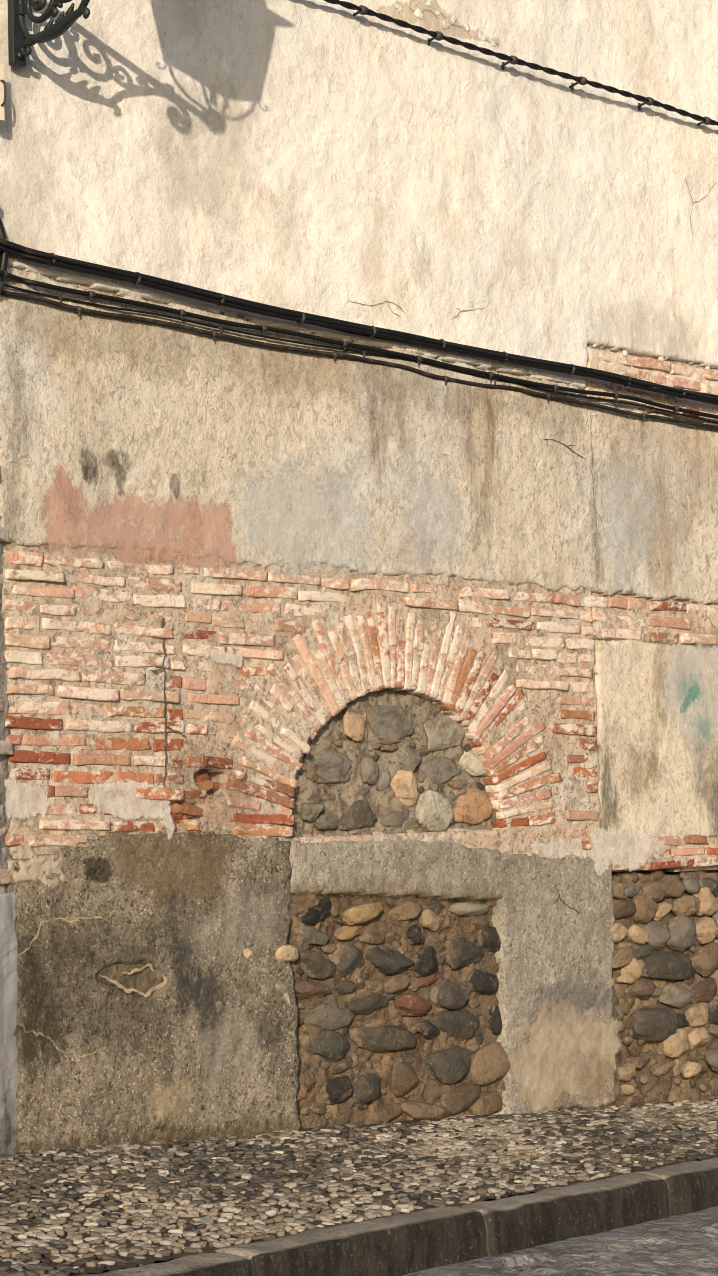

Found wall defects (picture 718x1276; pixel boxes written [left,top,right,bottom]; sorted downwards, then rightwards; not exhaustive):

peeling [395,0,499,47]
water stain [93,780,227,1027]
flaking render [96,962,167,997]